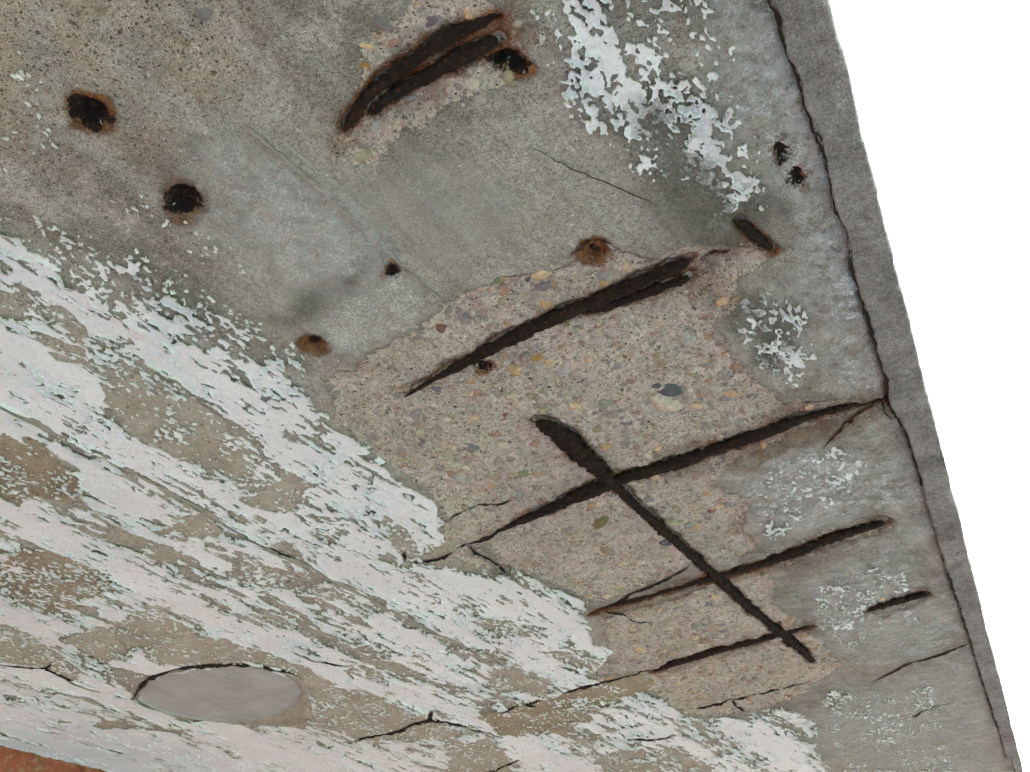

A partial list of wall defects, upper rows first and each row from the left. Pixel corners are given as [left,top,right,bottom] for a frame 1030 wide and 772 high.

peeling [2,69,59,162]
spalling [62,90,116,133]
spalling [125,177,246,274]
rust [338,10,533,134]
peeling [330,0,811,216]
water stain [644,99,777,244]
spalling [0,207,952,772]
rust [403,253,710,394]
rust [530,382,888,476]
crack [767,0,1008,760]
rust [587,487,817,664]